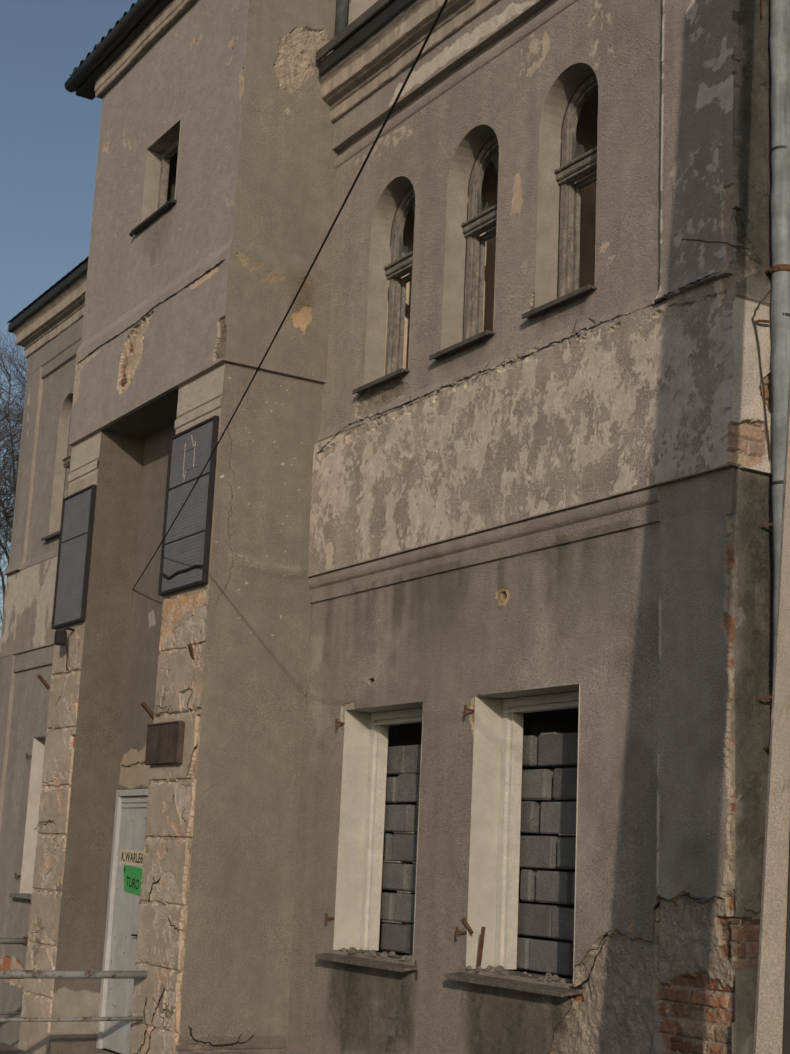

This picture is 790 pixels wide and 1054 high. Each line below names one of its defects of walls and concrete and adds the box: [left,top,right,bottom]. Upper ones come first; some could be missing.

flaking render [274,27,329,93]
peeling [390,0,536,105]
peeling [696,0,771,113]
crack [315,271,721,455]
peeling [310,95,766,570]
flaking render [759,374,772,414]
peeling [0,914,100,1038]
flaking render [132,590,226,1054]
crack [133,987,254,1054]
crack [547,930,613,1054]
flaking render [549,698,765,1054]
crack [652,894,717,939]